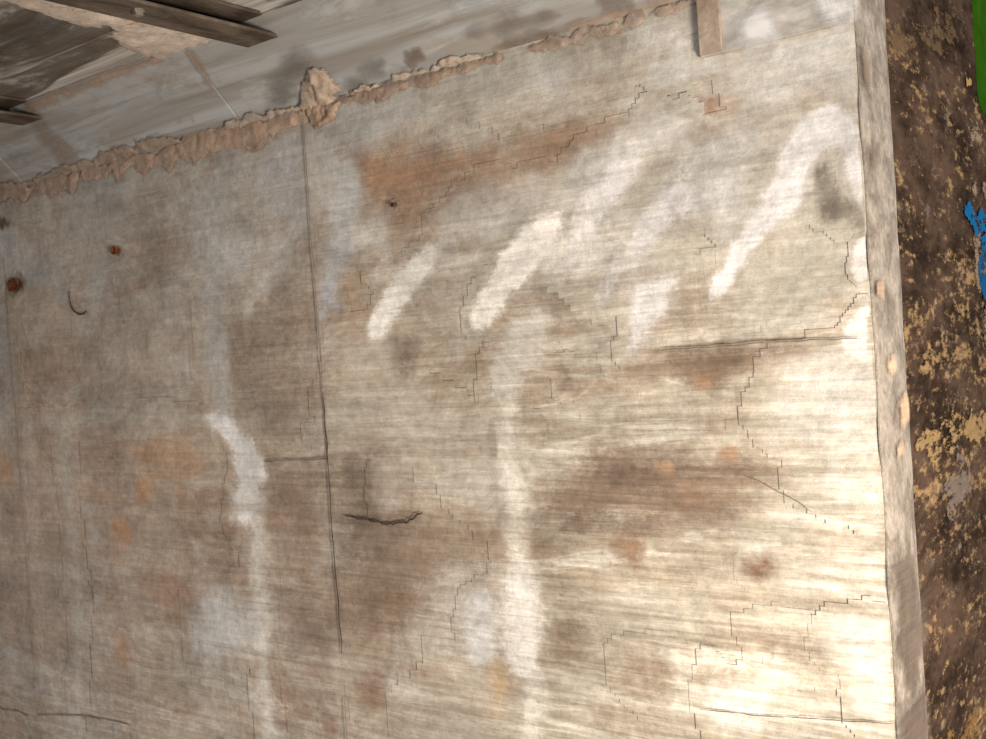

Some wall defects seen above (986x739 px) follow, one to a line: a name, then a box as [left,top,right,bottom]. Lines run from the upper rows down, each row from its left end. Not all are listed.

spalling [2,0,213,59]
spalling [529,0,696,53]
water stain [816,0,855,24]
spalling [0,53,504,204]
water stain [360,7,883,587]
crack [265,109,423,653]
water stain [0,3,717,739]
water stain [604,596,895,739]
water stain [895,558,926,683]
water stain [903,697,929,739]